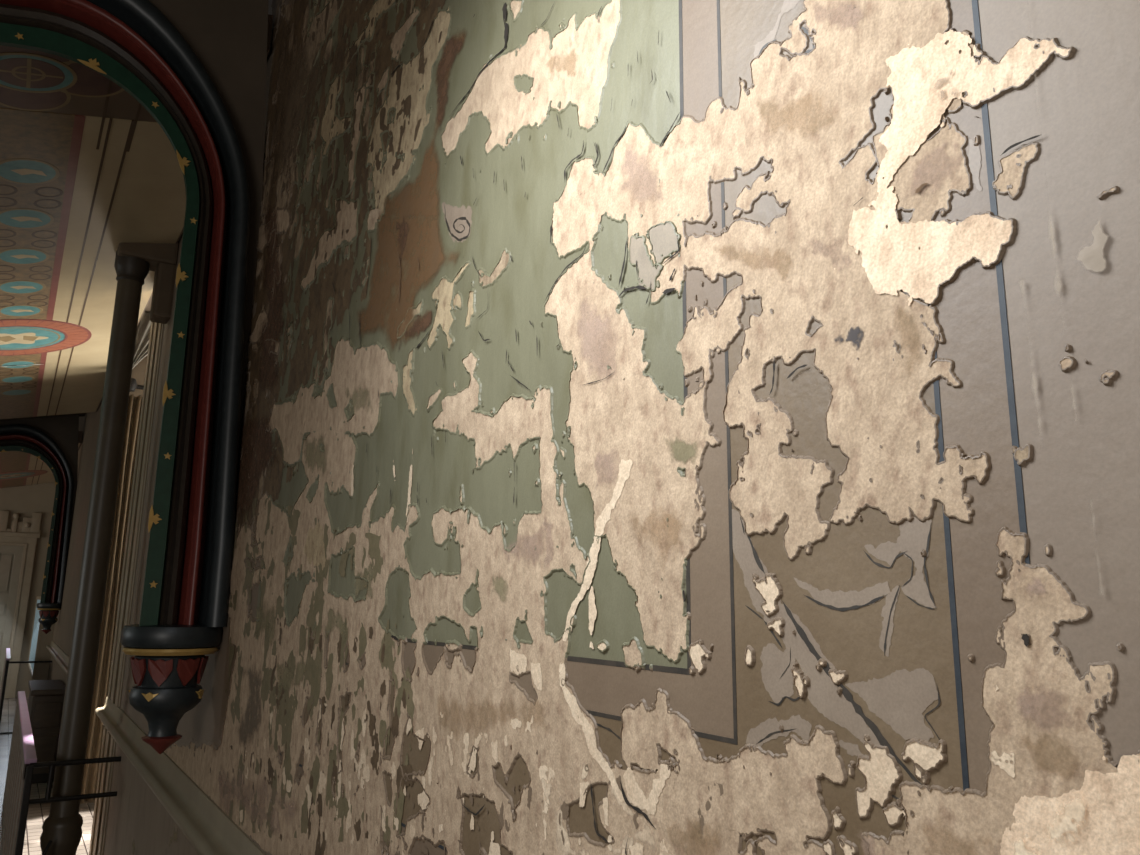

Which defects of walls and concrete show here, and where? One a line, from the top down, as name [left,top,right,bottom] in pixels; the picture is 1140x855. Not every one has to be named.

peeling [441,0,622,169]
peeling [1097,186,1120,200]
peeling [402,247,512,417]
peeling [544,0,1075,676]
peeling [164,296,1140,855]